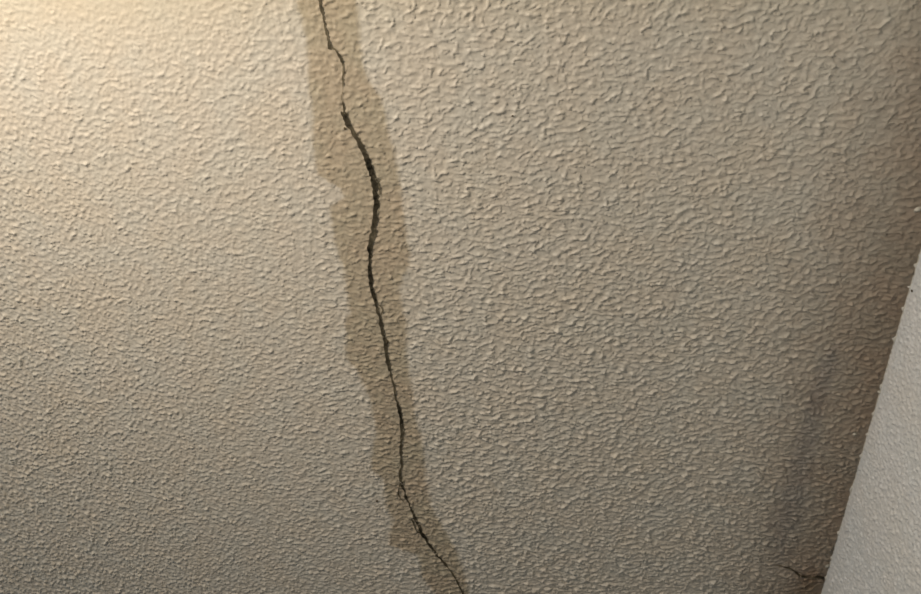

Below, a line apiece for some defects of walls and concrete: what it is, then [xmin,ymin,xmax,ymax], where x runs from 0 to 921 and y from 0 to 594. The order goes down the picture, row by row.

crack [318,0,464,594]